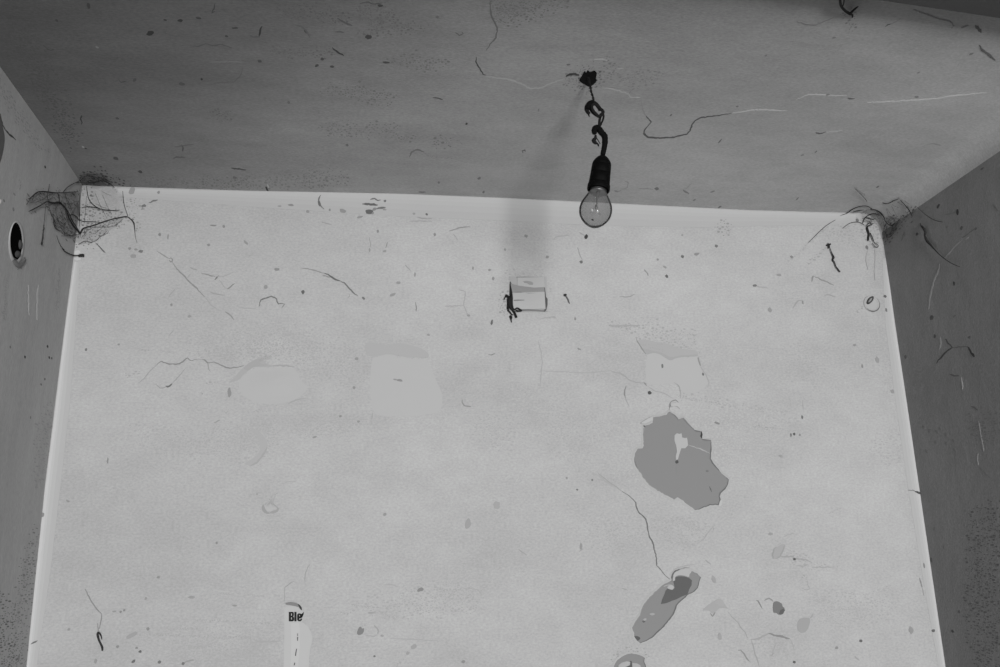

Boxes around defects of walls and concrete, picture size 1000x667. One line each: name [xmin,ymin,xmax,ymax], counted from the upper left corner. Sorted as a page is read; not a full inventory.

crack [475,1,563,90]
crack [604,88,985,139]
crack [125,349,294,394]
crack [538,316,736,626]
peeling [632,410,730,512]
peeling [611,567,703,667]